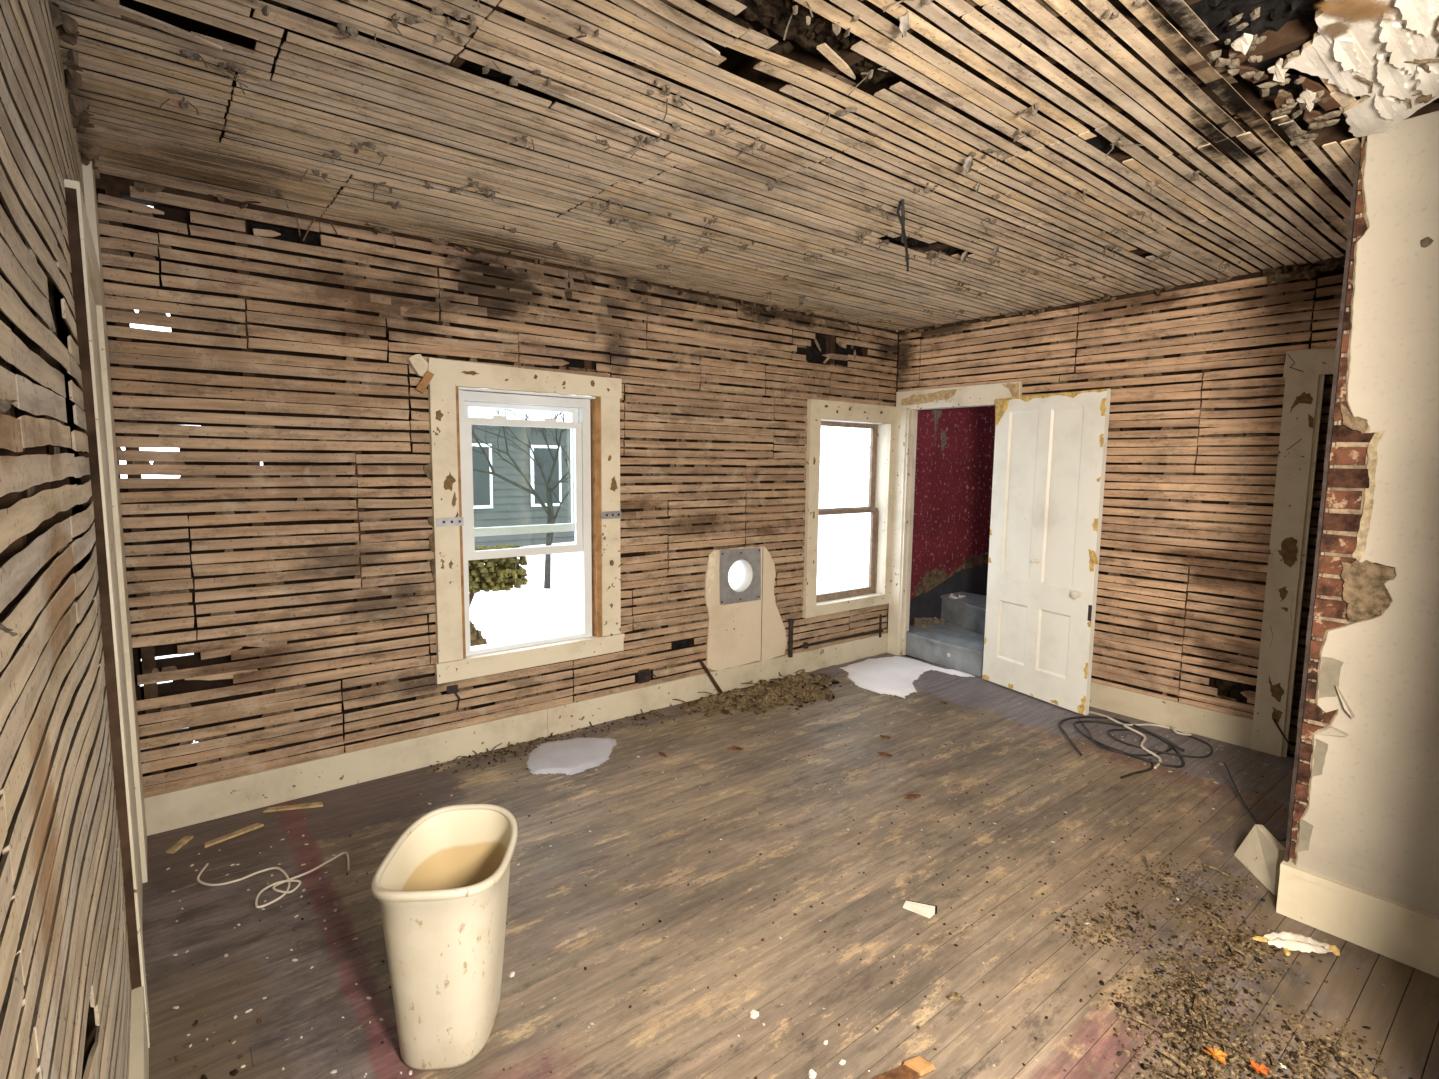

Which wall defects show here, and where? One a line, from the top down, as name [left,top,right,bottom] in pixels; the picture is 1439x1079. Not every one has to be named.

spalling [708,0,864,63]
flaking render [899,12,910,38]
spalling [850,51,906,84]
spalling [1412,93,1439,104]
spalling [1289,141,1397,864]
peeling [1279,537,1298,568]
spalling [1216,676,1284,722]